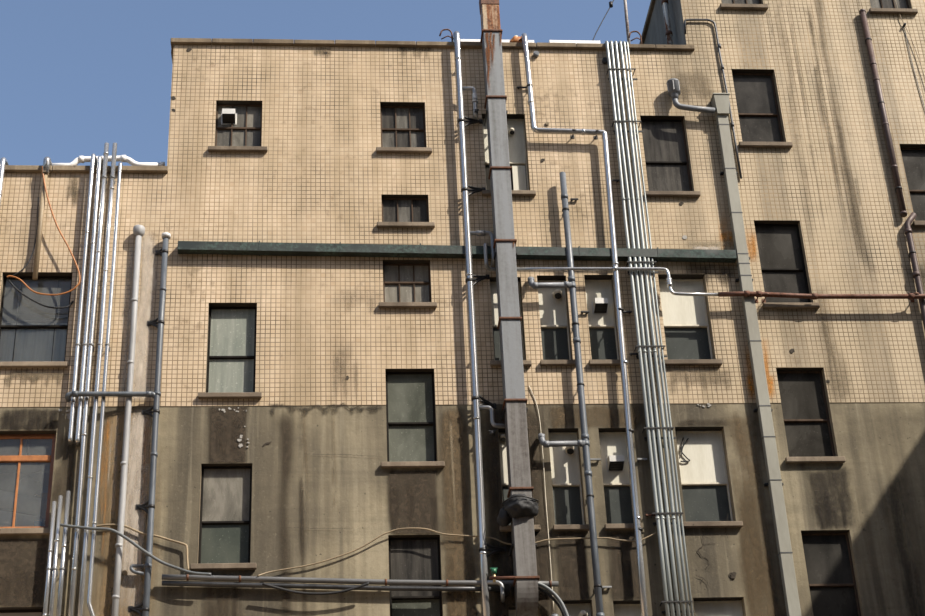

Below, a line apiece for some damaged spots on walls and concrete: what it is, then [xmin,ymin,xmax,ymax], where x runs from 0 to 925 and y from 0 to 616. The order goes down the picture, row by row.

damp [271,403,381,499]
damp [208,575,239,616]